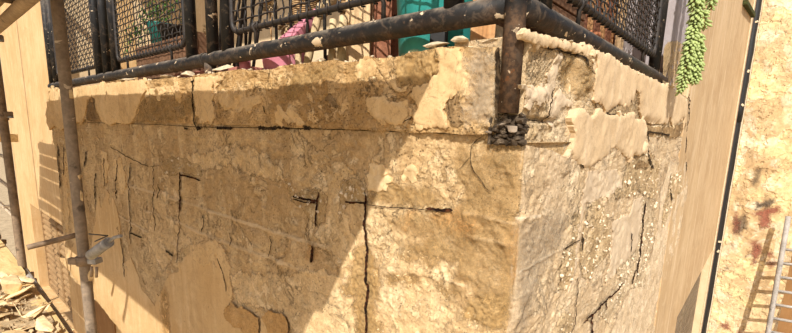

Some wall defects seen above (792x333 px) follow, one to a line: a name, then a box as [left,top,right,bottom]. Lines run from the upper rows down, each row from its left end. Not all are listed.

peeling [45,85,64,130]
peeling [73,77,182,125]
peeling [354,56,380,82]
peeling [390,47,473,133]
crack [56,144,64,186]
crack [84,147,201,266]
peeling [91,142,419,333]
crack [293,192,319,227]
crack [345,191,453,333]
peeling [485,28,688,333]
crack [571,203,646,333]